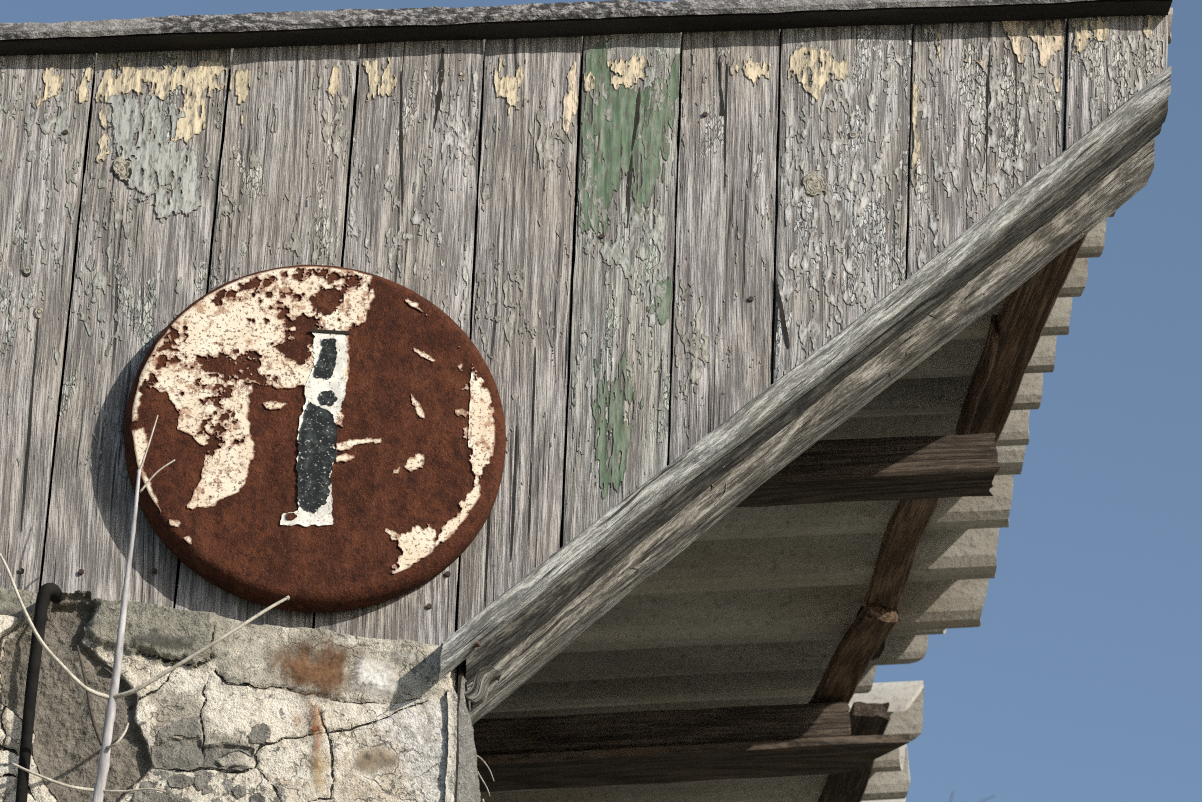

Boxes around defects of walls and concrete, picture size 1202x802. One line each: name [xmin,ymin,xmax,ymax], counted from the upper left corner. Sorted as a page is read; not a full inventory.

peeling [33,57,251,219]
peeling [494,56,527,116]
peeling [561,41,680,237]
peeling [730,57,771,84]
peeling [788,45,854,101]
peeling [1001,17,1109,93]
peeling [591,352,644,499]
crack [0,689,36,800]
flaking render [0,590,271,802]
crack [138,627,426,802]
corrosion [273,638,353,768]
crack [454,663,462,802]